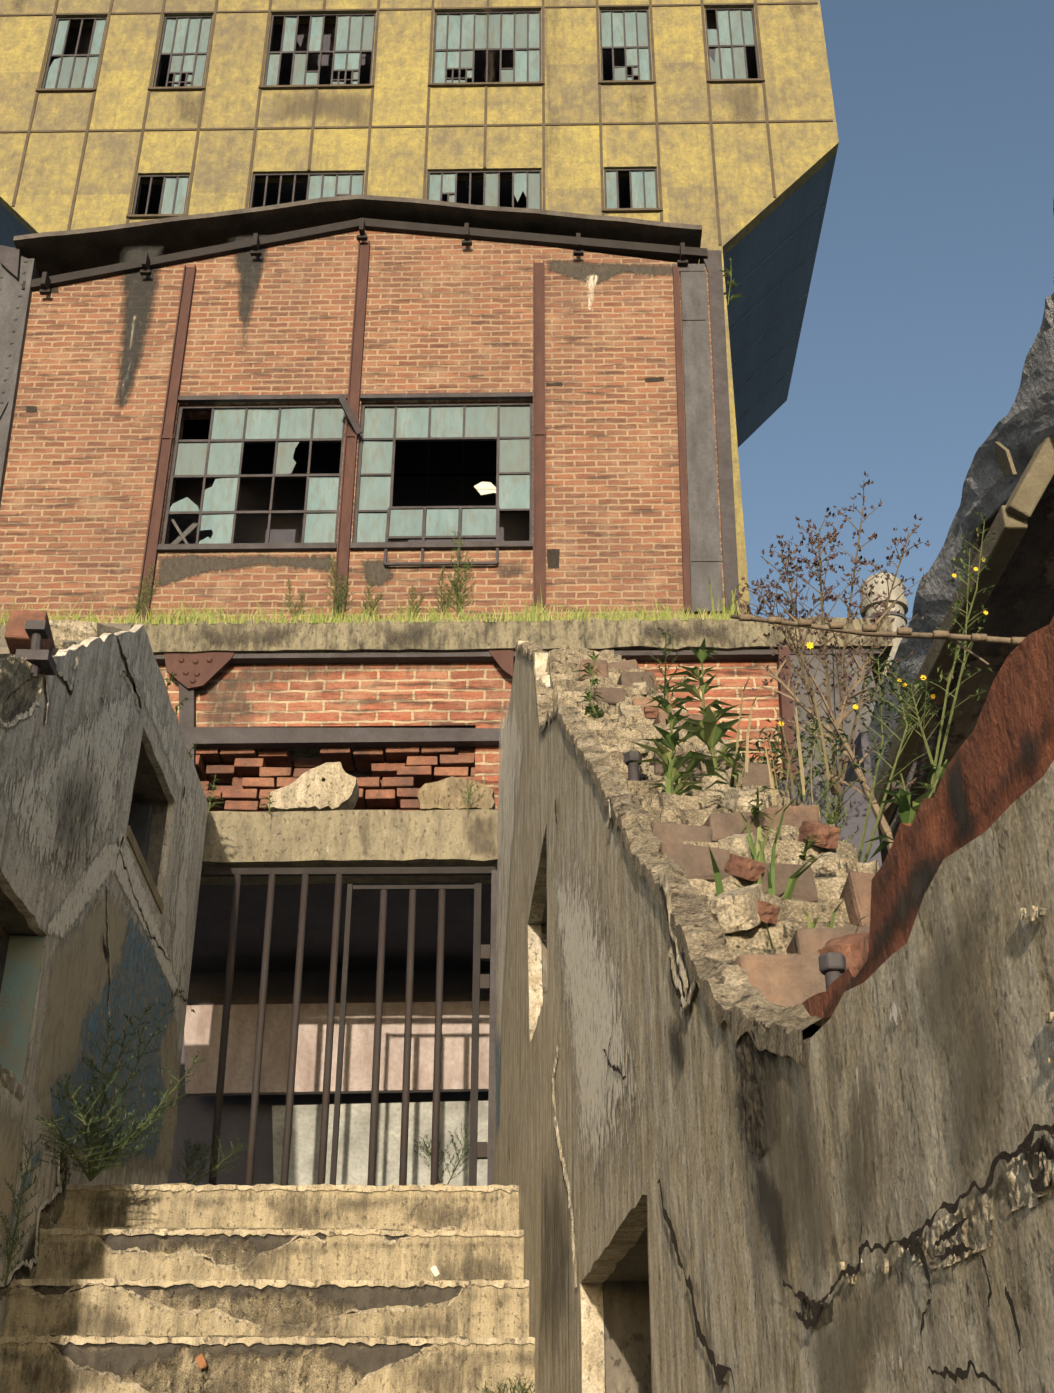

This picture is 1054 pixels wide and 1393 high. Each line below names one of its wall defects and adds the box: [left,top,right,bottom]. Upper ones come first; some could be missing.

damp [117,247,160,407]
damp [233,235,268,323]
peeling [0,653,471,1393]
crack [658,1178,735,1391]
crack [783,1124,1054,1393]